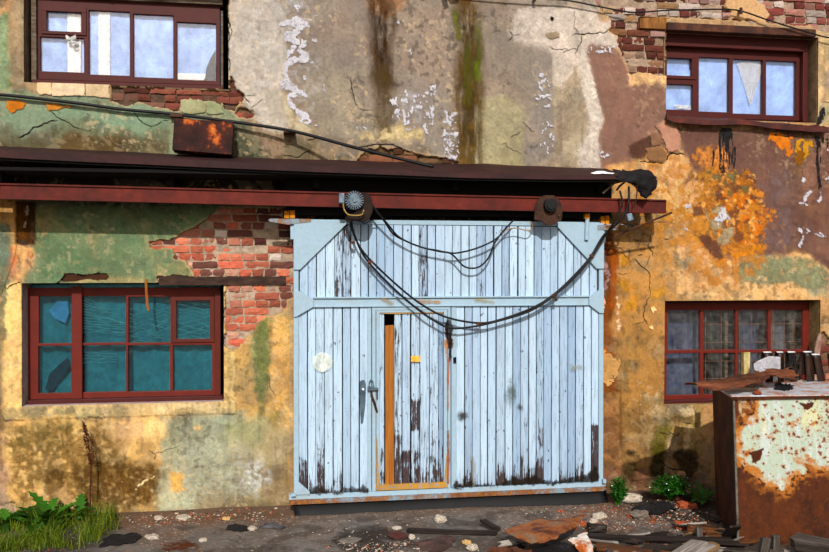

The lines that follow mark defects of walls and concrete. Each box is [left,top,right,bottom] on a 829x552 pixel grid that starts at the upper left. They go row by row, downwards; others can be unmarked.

peeling [6,99,25,113]
crack [18,107,93,138]
spalling [37,0,285,128]
water stain [279,1,318,126]
water stain [370,0,483,164]
crack [552,0,609,55]
spalling [513,0,756,174]
spalling [757,0,829,33]
spalling [150,208,311,349]
crack [619,222,668,324]
water stain [9,426,159,508]